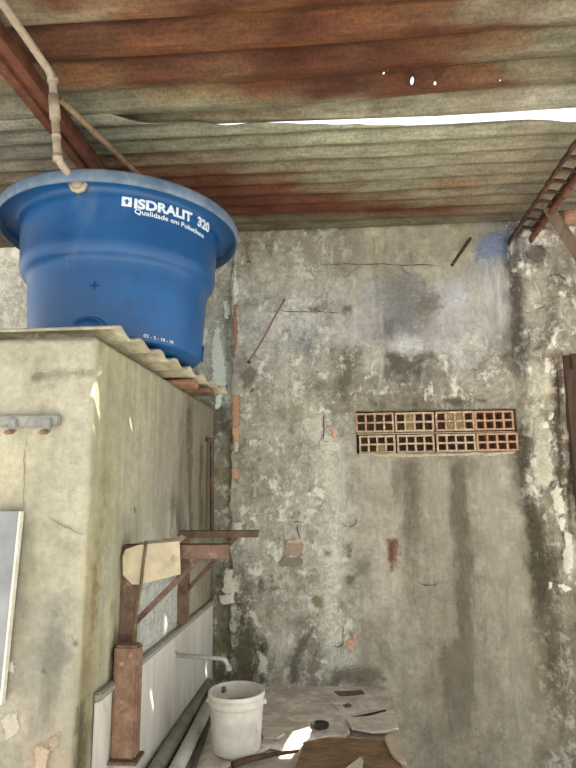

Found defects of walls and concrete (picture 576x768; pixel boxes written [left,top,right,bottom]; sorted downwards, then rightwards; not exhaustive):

peeling [210,270,240,452]
crack [322,263,436,273]
damp [379,274,439,386]
damp [509,251,523,345]
spalling [526,246,545,267]
damp [516,423,532,475]
peeling [530,410,576,594]
spalling [278,540,303,567]
damp [452,462,472,642]
damp [520,486,556,615]
spalling [0,711,20,740]
spalling [32,732,60,768]